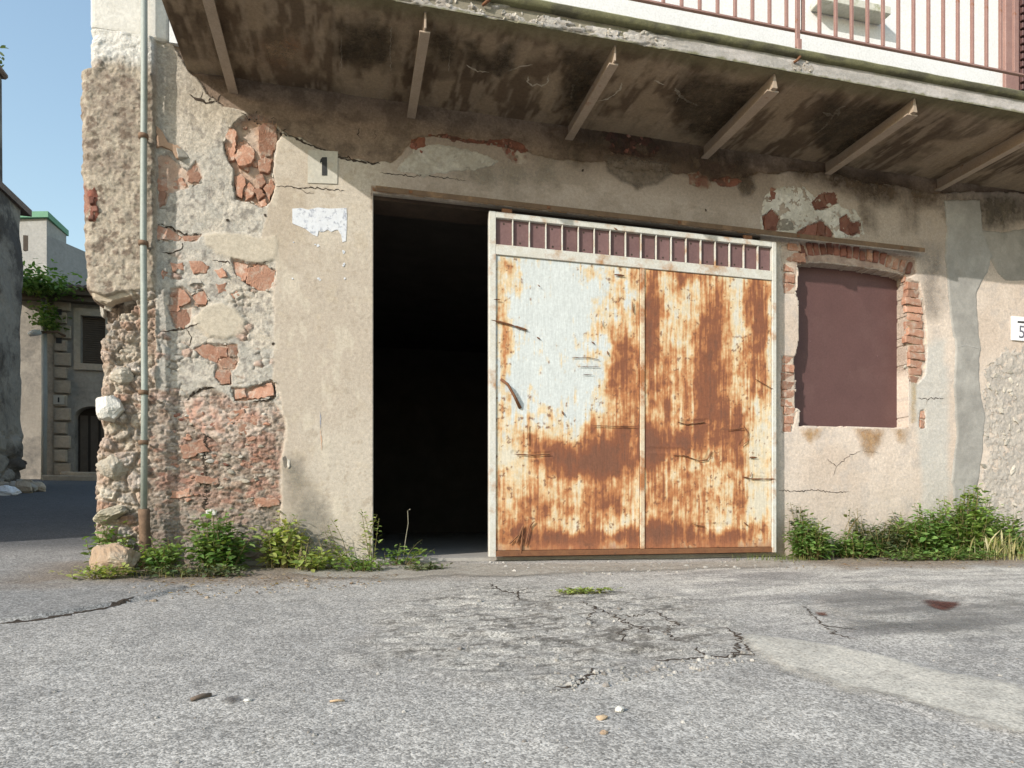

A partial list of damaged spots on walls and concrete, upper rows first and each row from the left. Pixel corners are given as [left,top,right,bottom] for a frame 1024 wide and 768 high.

damp [654,76,757,136]
flaking render [222,115,282,217]
flaking render [397,133,528,178]
flaking render [602,131,660,157]
flaking render [161,259,276,329]
flaking render [760,186,927,383]
spalling [170,343,276,504]